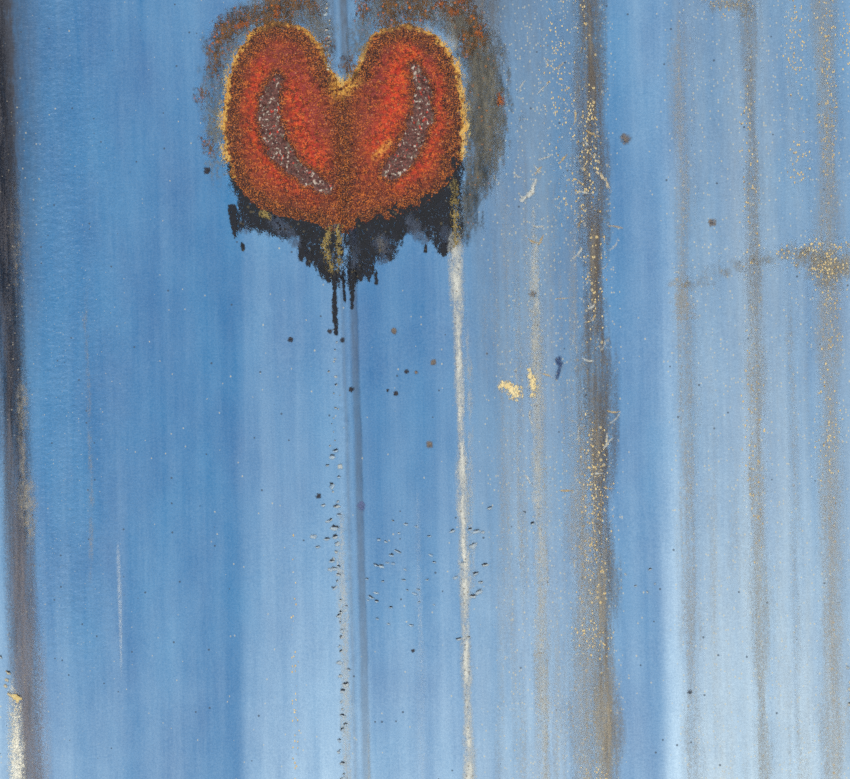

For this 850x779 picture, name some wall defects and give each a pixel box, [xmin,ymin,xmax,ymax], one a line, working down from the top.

rust [200,0,489,234]
rust [539,0,623,779]